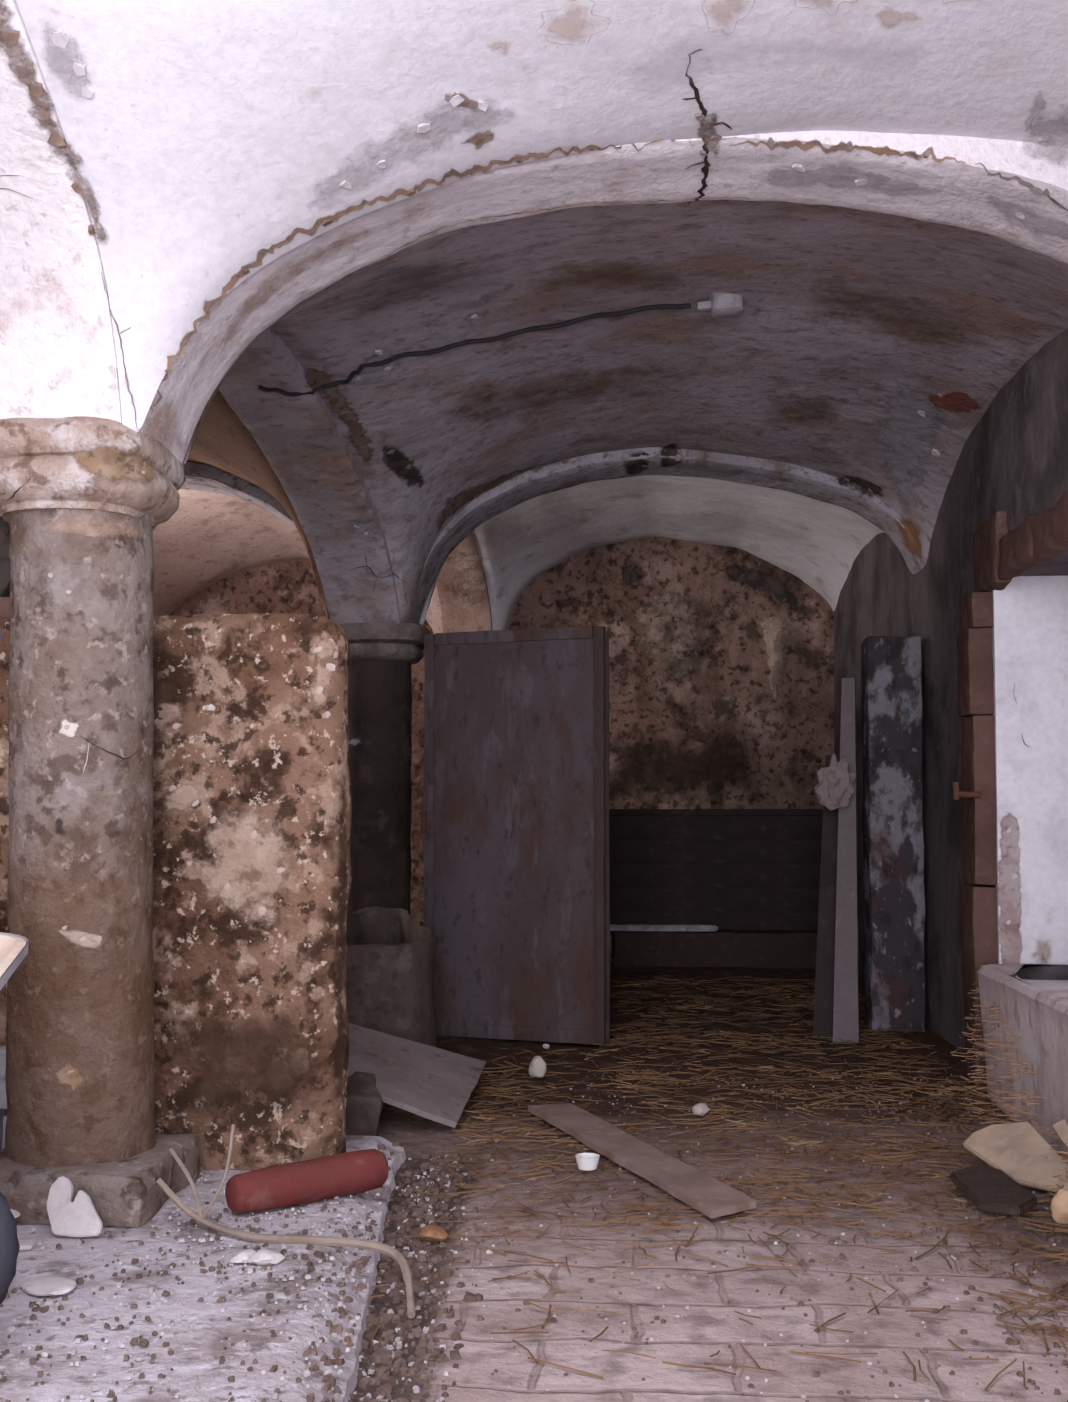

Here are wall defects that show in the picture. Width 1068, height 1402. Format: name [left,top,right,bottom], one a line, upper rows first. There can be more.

spalling [0,0,106,241]
crack [683,49,732,207]
peeling [151,92,675,414]
spalling [343,197,749,278]
spalling [306,350,425,487]
leakage [153,641,176,761]
leakage [609,733,761,801]
leakage [335,777,347,1096]
peeling [998,813,1022,964]